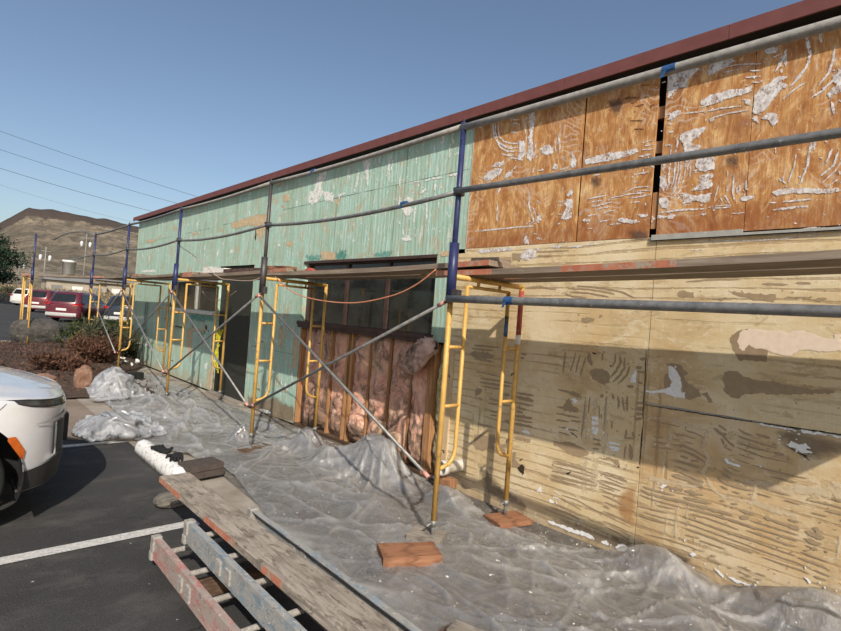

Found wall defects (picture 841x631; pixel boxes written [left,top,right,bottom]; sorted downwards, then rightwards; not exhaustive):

peeling [811,45,841,114]
peeling [483,34,822,229]
peeling [231,206,267,241]
peeling [321,251,336,260]
peeling [278,152,457,247]
peeling [475,192,544,260]
peeling [550,188,601,250]
peeling [767,141,841,218]
peeling [730,328,841,362]
peeling [645,363,713,406]
peeling [722,371,834,404]
peeling [778,424,812,460]